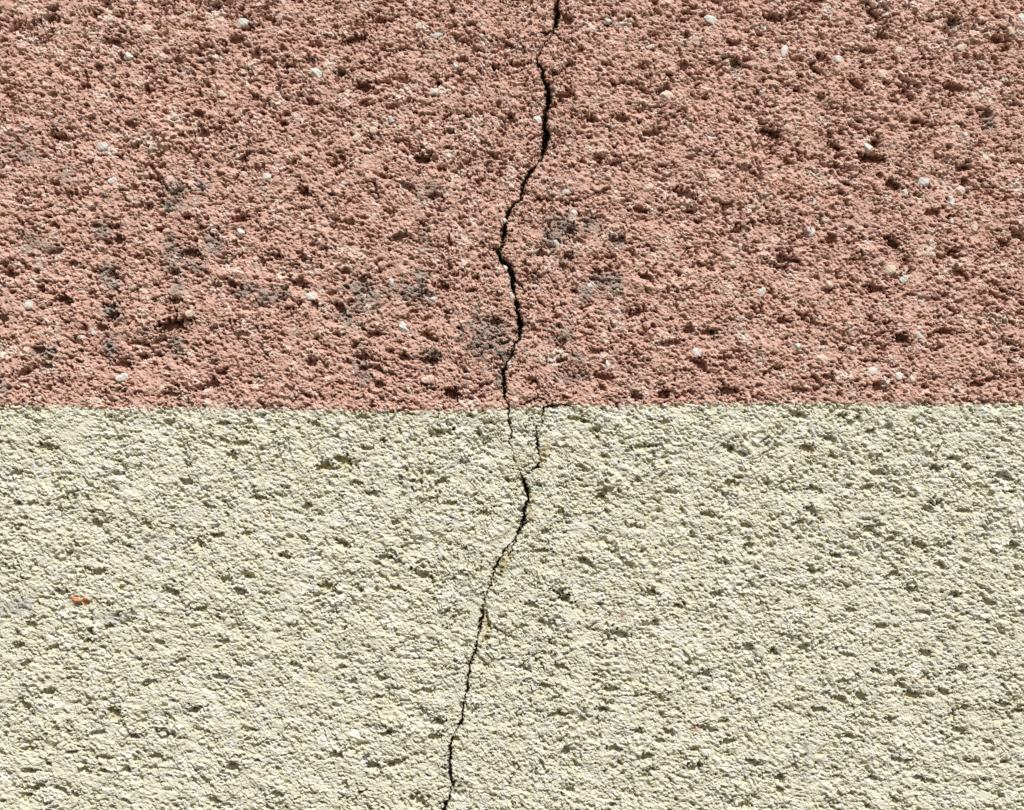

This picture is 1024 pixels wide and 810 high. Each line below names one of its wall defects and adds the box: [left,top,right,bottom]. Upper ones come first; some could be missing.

crack [442,0,573,810]